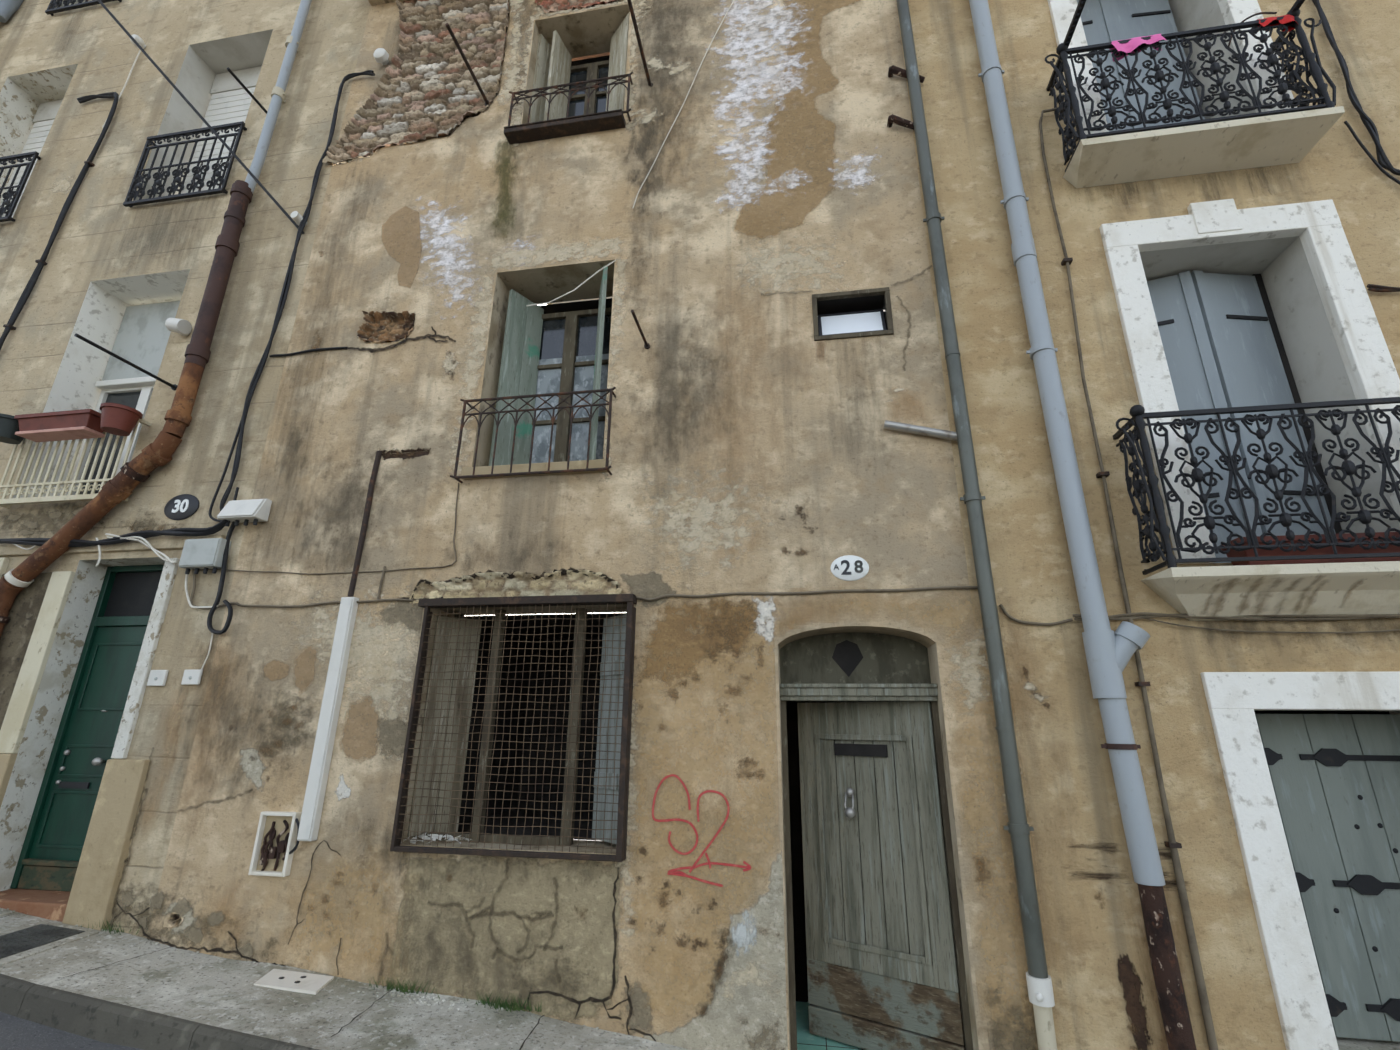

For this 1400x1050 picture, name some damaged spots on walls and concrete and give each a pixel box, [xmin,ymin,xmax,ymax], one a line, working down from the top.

flaking render [323,0,635,166]
damp [634,0,689,153]
damp [709,0,873,238]
spalling [357,311,415,343]
efflorescence [416,199,475,306]
peeling [240,591,339,788]
spalling [341,568,622,760]
damp [634,598,763,699]
crack [111,747,341,966]
crack [379,856,656,1042]